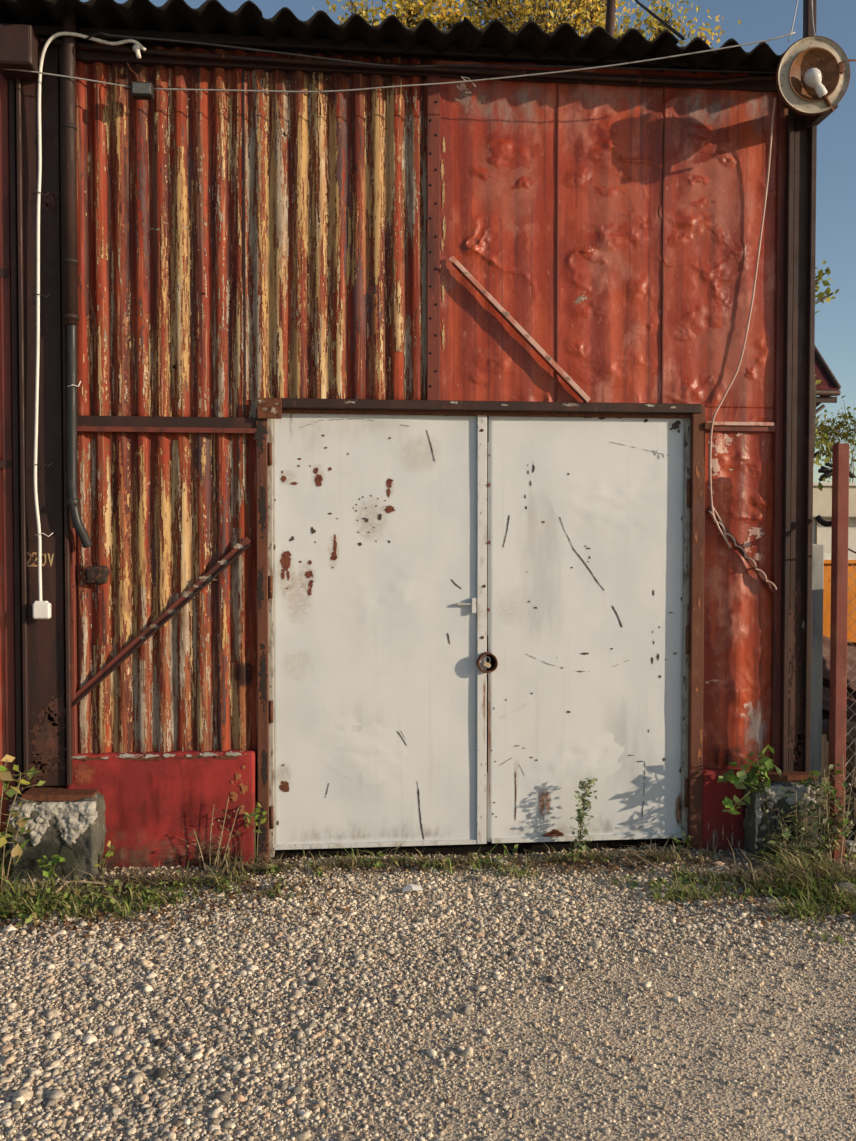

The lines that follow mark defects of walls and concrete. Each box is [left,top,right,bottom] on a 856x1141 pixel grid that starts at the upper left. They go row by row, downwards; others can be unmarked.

peeling [82,66,446,418]
rust [297,458,332,486]
peeling [696,433,742,497]
rust [280,536,314,596]
rust [352,478,395,546]
peeling [742,527,765,561]
peeling [72,432,256,837]
rust [29,693,66,788]